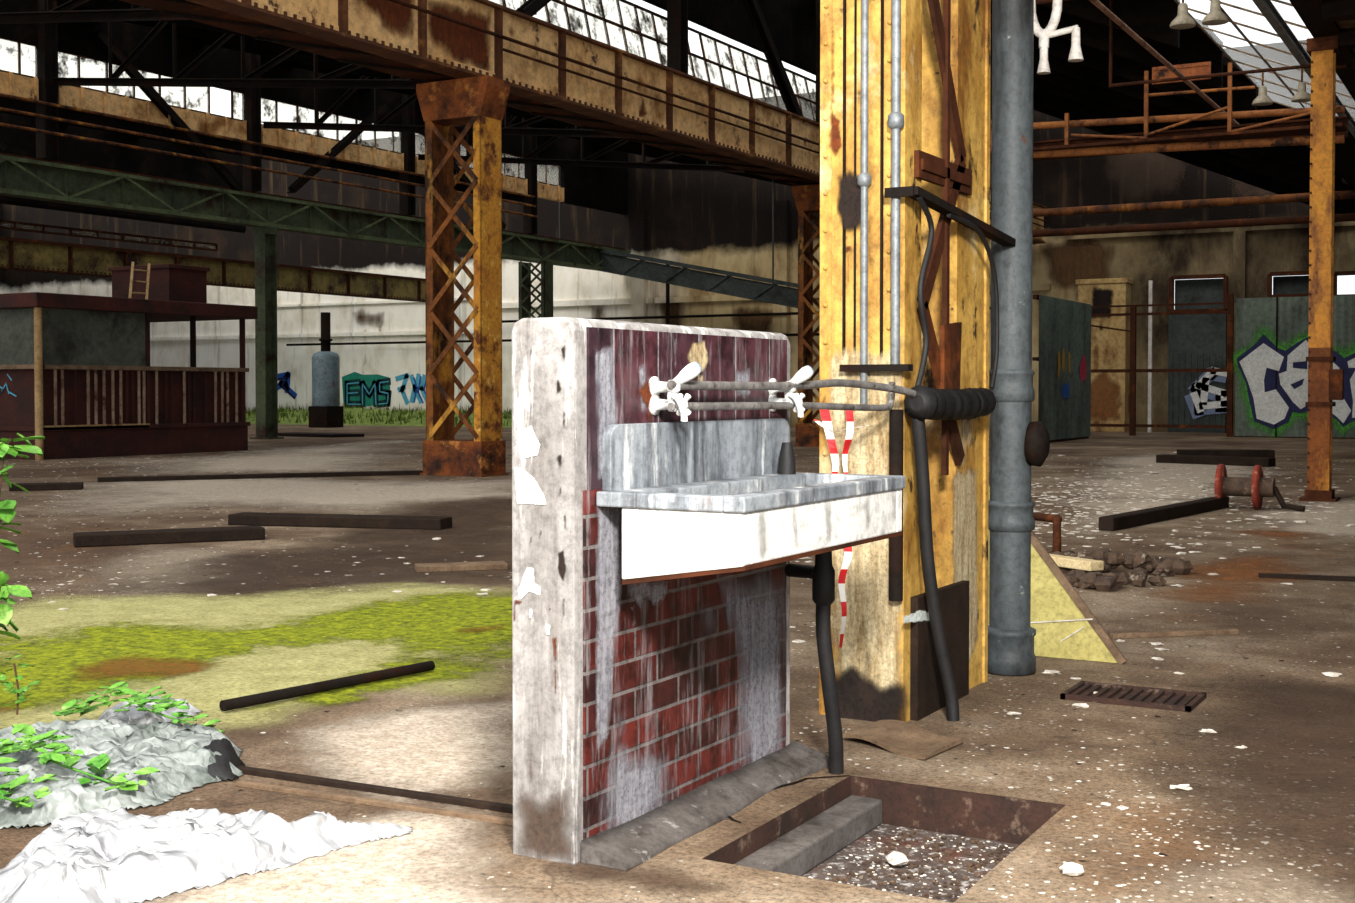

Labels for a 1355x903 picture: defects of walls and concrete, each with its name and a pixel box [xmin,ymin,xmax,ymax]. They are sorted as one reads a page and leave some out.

rust [363,0,413,36]
rust [430,4,490,70]
peeling [514,426,546,505]
peeling [518,567,541,618]
spalling [558,551,566,579]
efflorescence [598,508,667,741]
efflorescence [727,591,781,762]